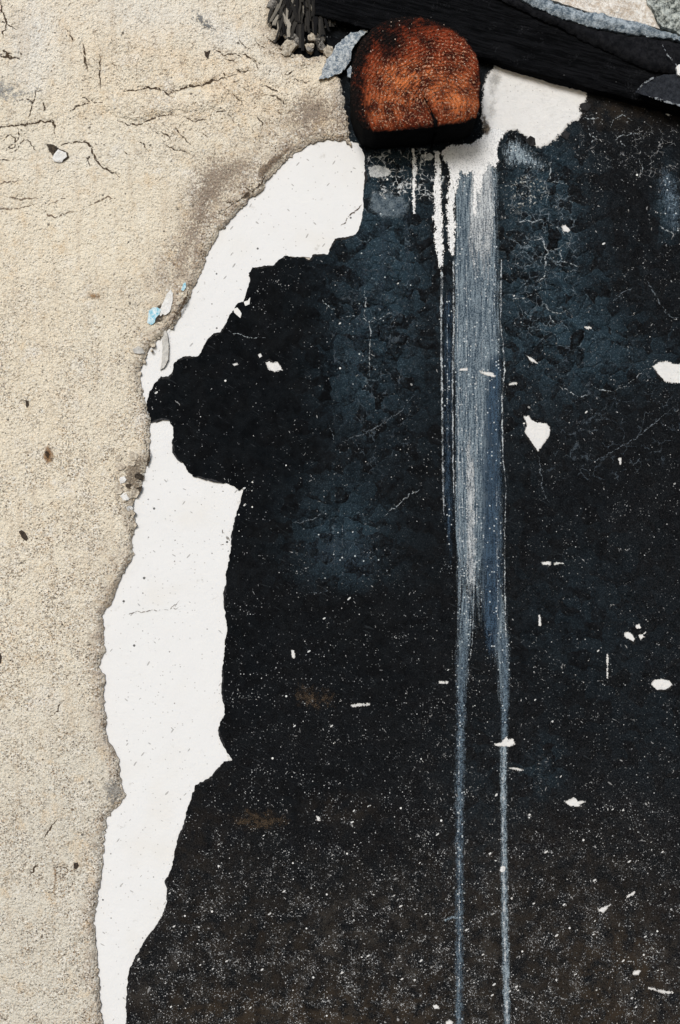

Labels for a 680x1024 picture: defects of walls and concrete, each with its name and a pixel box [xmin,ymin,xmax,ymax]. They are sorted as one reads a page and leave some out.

crack [0,30,309,218]
peeling [524,416,550,453]
peeling [653,361,680,384]
peeling [93,139,391,1024]
leakage [370,116,542,1024]